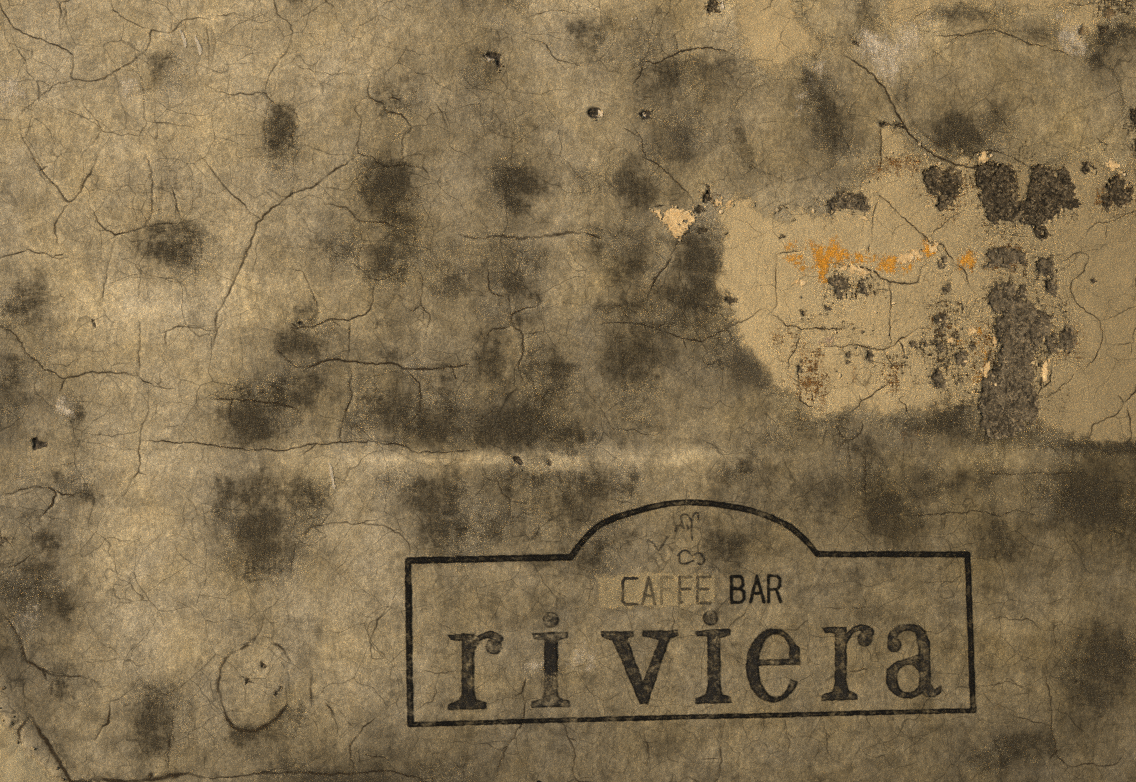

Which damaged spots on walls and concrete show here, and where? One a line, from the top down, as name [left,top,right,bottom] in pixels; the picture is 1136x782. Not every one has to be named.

water stain [863,26,919,80]
crack [851,59,1025,176]
water stain [144,222,199,264]
crack [211,97,411,340]
rust [782,235,936,290]
peeling [649,108,1136,446]
water stain [218,328,327,445]
crack [134,273,468,477]
water stain [362,348,584,453]
crack [614,197,968,501]
water stain [215,471,313,574]
crack [17,721,412,782]